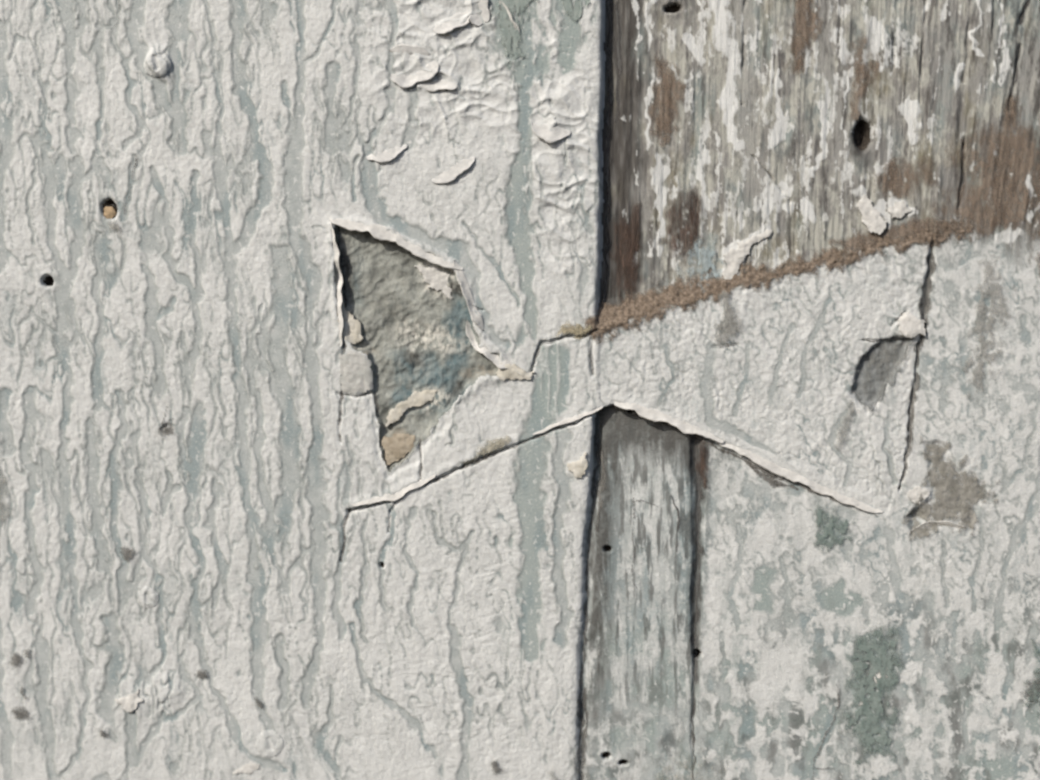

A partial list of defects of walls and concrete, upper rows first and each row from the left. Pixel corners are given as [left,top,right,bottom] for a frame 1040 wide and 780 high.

peeling [432,0,540,68]
peeling [562,0,590,22]
peeling [388,44,458,92]
peeling [366,144,408,163]
peeling [431,157,475,184]
peeling [532,123,571,144]
spalling [329,218,535,472]
crack [532,333,593,374]
peeling [852,311,925,411]
crack [862,242,936,489]
peeling [902,442,998,540]